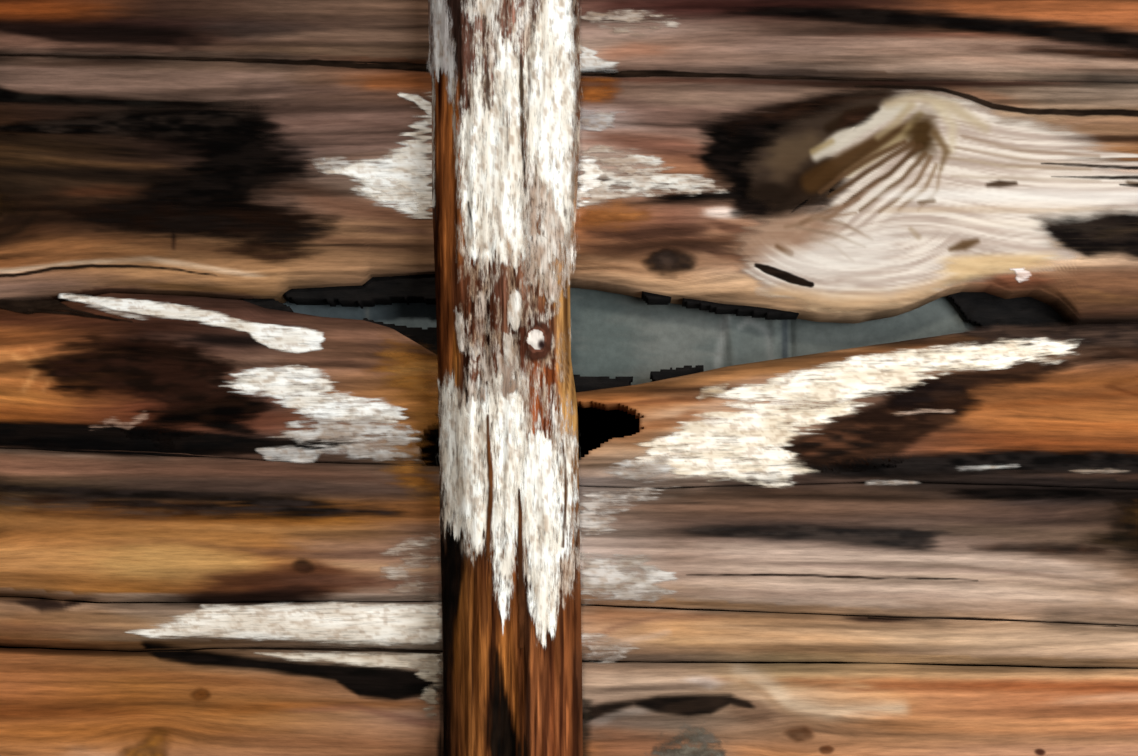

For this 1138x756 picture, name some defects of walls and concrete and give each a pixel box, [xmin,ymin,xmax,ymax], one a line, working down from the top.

leakage [0,88,332,260]
crack [755,264,814,287]
leakage [0,336,352,456]
leakage [784,325,1138,477]
leakage [687,524,944,550]
leakage [953,489,1138,554]
leakage [142,523,463,756]
leakage [487,650,527,756]
leakage [582,695,753,756]